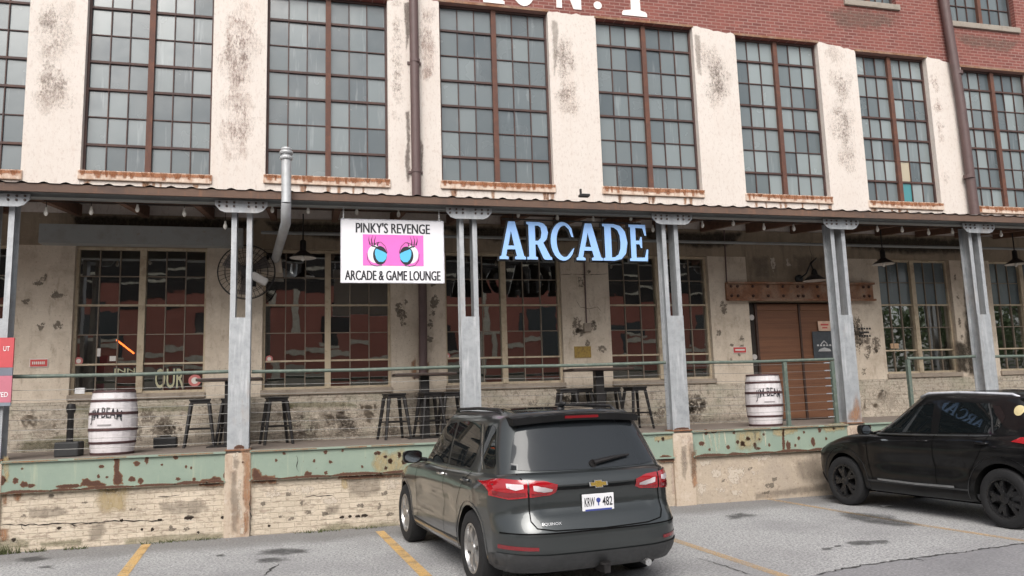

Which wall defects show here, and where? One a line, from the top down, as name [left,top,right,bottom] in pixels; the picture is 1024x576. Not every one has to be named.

rust [79,170,212,188]
rust [264,175,390,194]
rust [603,186,704,204]
rust [748,193,833,210]
rust [870,201,944,212]
peeling [853,316,881,375]